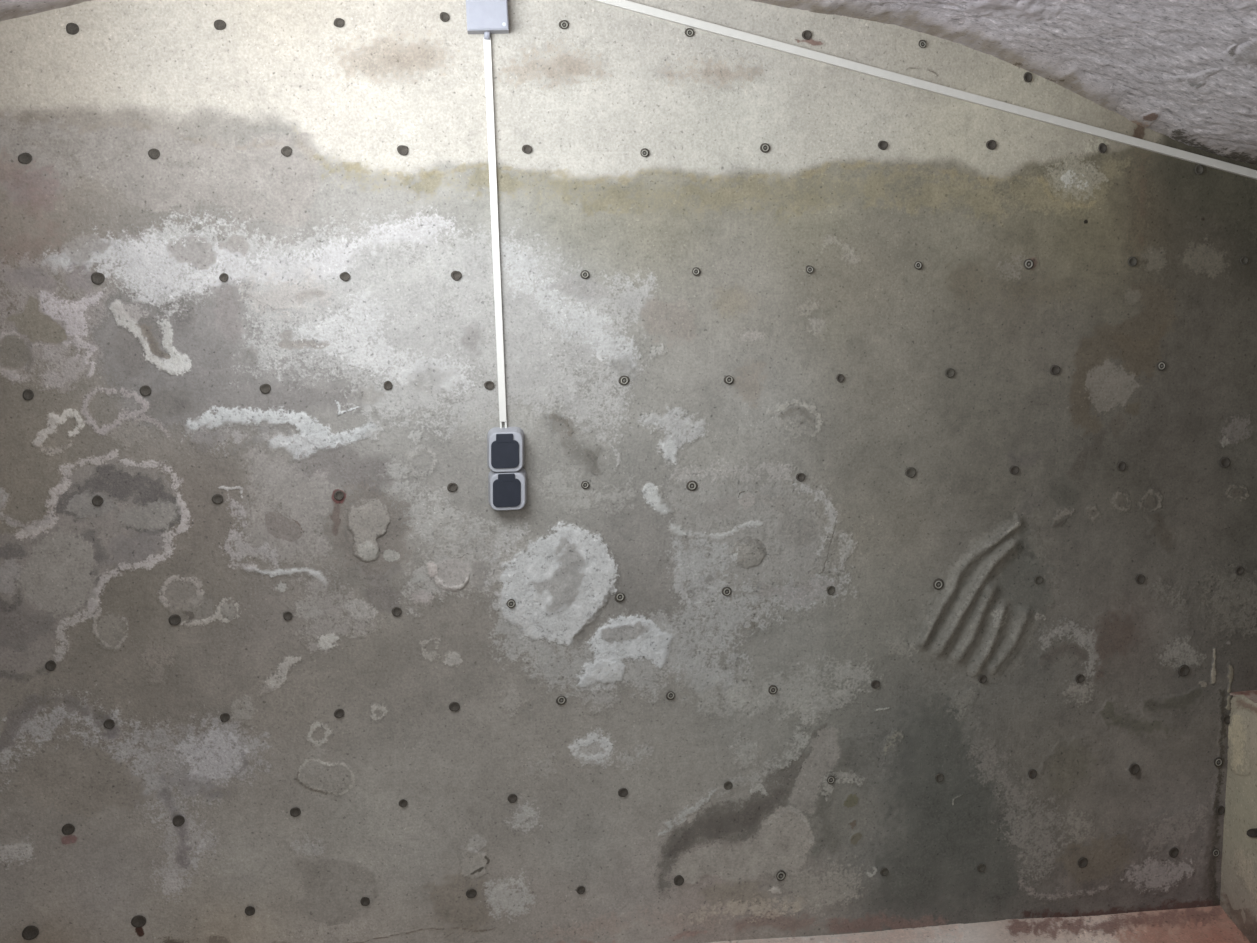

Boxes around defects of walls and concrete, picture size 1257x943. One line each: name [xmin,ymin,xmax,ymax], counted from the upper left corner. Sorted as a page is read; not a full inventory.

leakage [0,101,1113,688]
leakage [985,152,1257,741]
leakage [0,652,333,913]
leakage [270,830,382,943]
leakage [413,860,547,943]
leakage [479,530,1257,943]